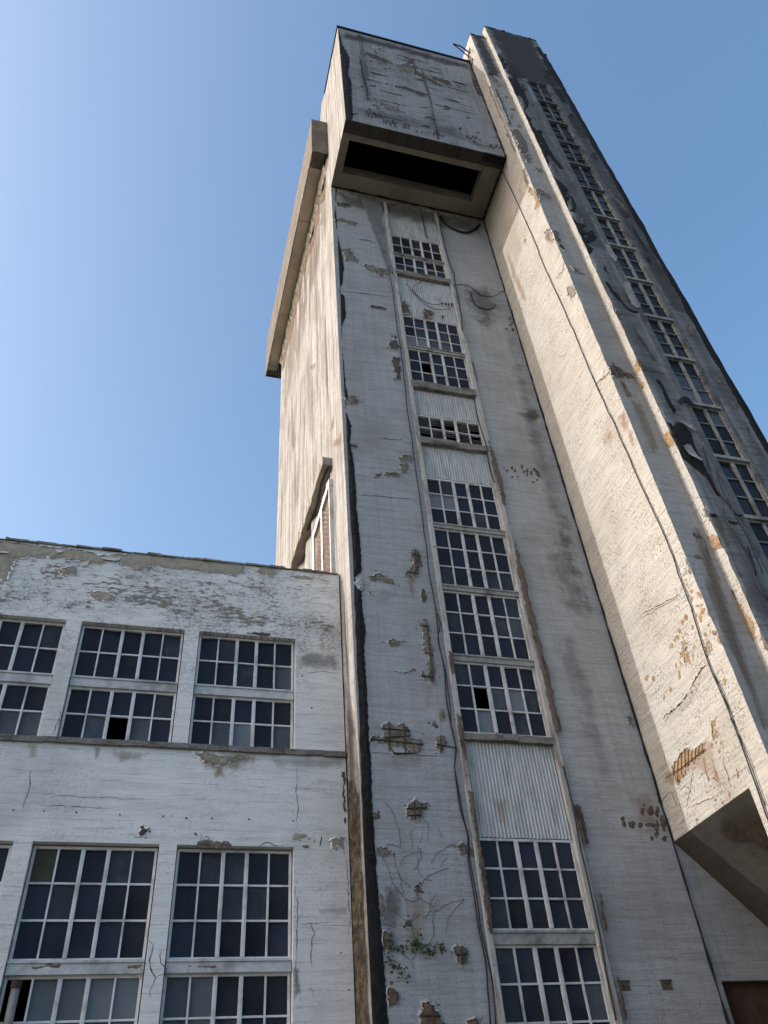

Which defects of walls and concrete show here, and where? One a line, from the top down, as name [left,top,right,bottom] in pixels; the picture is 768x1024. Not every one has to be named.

peeling [353,45,501,149]
spalling [663,431,674,449]
peeling [0,541,335,640]
spalling [367,548,427,604]
crack [640,594,680,619]
spalling [415,617,441,686]
peeling [192,750,250,768]
spalling [369,708,455,762]
spalling [665,716,724,787]
spalling [403,797,430,823]
peeling [620,800,667,842]